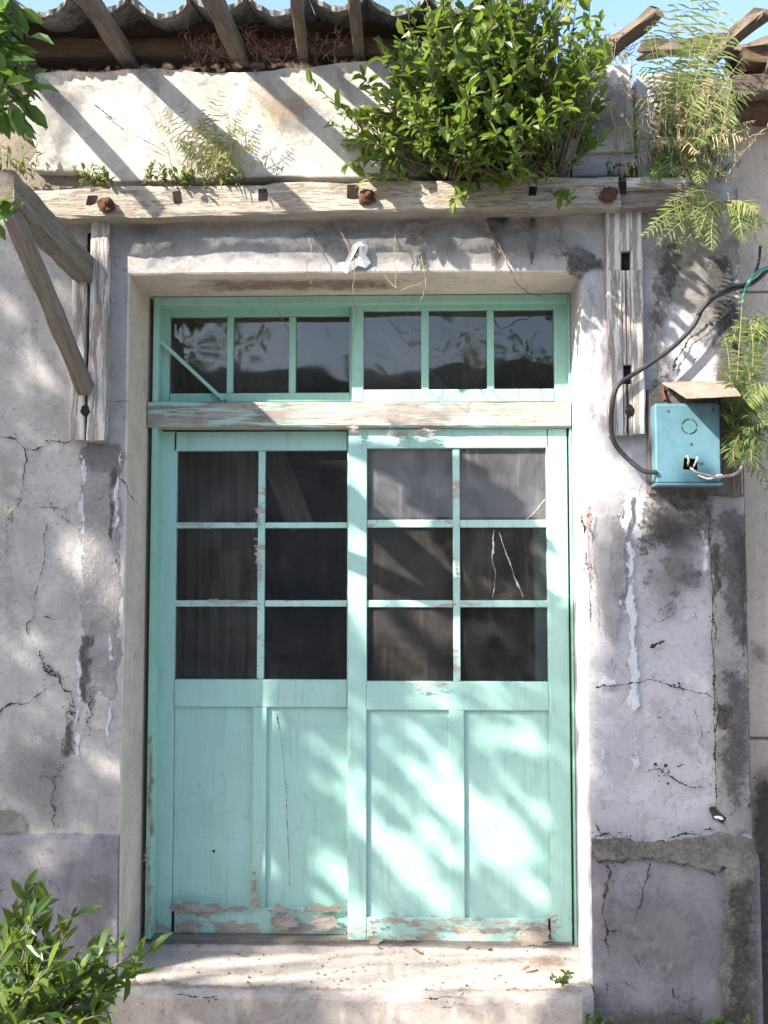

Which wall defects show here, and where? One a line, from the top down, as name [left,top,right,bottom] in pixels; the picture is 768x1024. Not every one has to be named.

water stain [648,217,742,410]
peeling [384,427,437,440]
crack [0,434,94,834]
flaking render [78,444,123,707]
crack [596,514,727,810]
water stain [619,490,748,713]
peeling [169,871,346,935]
peeling [368,917,449,946]
peeling [470,918,557,947]
crack [600,863,651,991]
water stain [605,997,708,1024]
water stain [716,667,768,1024]